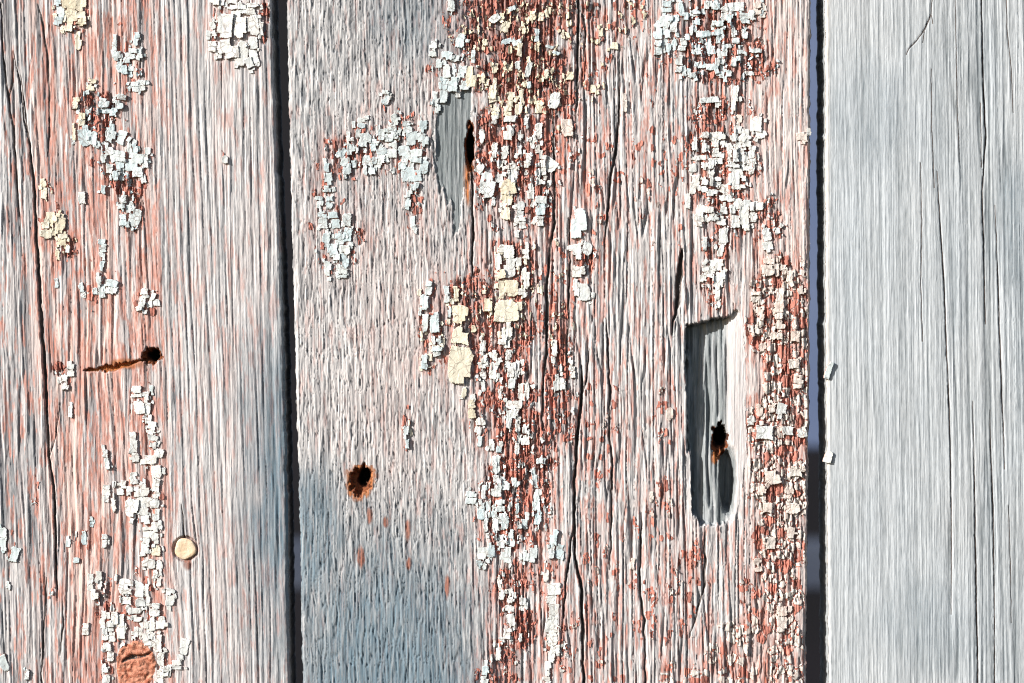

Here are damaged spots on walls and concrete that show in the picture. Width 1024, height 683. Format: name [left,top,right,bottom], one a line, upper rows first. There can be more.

peeling [52,0,90,50]
peeling [206,0,270,74]
peeling [70,22,153,233]
peeling [38,178,78,262]
crack [0,4,64,683]
peeling [78,239,119,312]
corrosion [93,359,140,373]
peeling [133,288,161,316]
spalling [308,0,808,683]
crack [541,0,613,683]
peeling [82,382,191,683]
corrosion [347,465,388,527]